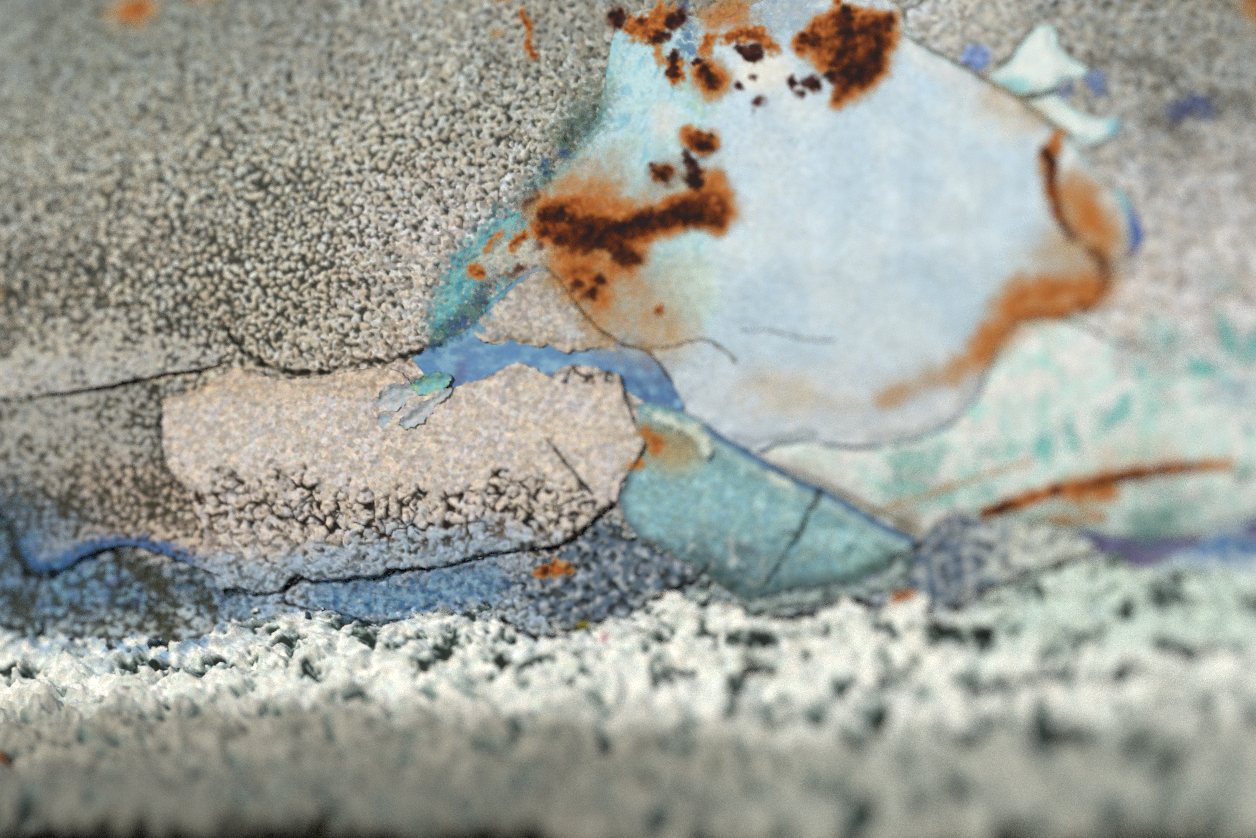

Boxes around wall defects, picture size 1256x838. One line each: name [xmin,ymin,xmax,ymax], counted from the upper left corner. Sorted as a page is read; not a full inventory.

corrosion [495,0,539,60]
corrosion [607,0,902,111]
peeling [0,0,1143,601]
corrosion [466,123,739,352]
corrosion [877,128,1129,407]
crack [51,366,210,397]
crack [225,326,442,376]
corrosion [981,457,1235,526]
crack [222,445,613,627]
corrosion [532,558,574,579]
crack [500,616,606,642]
crack [720,600,892,621]